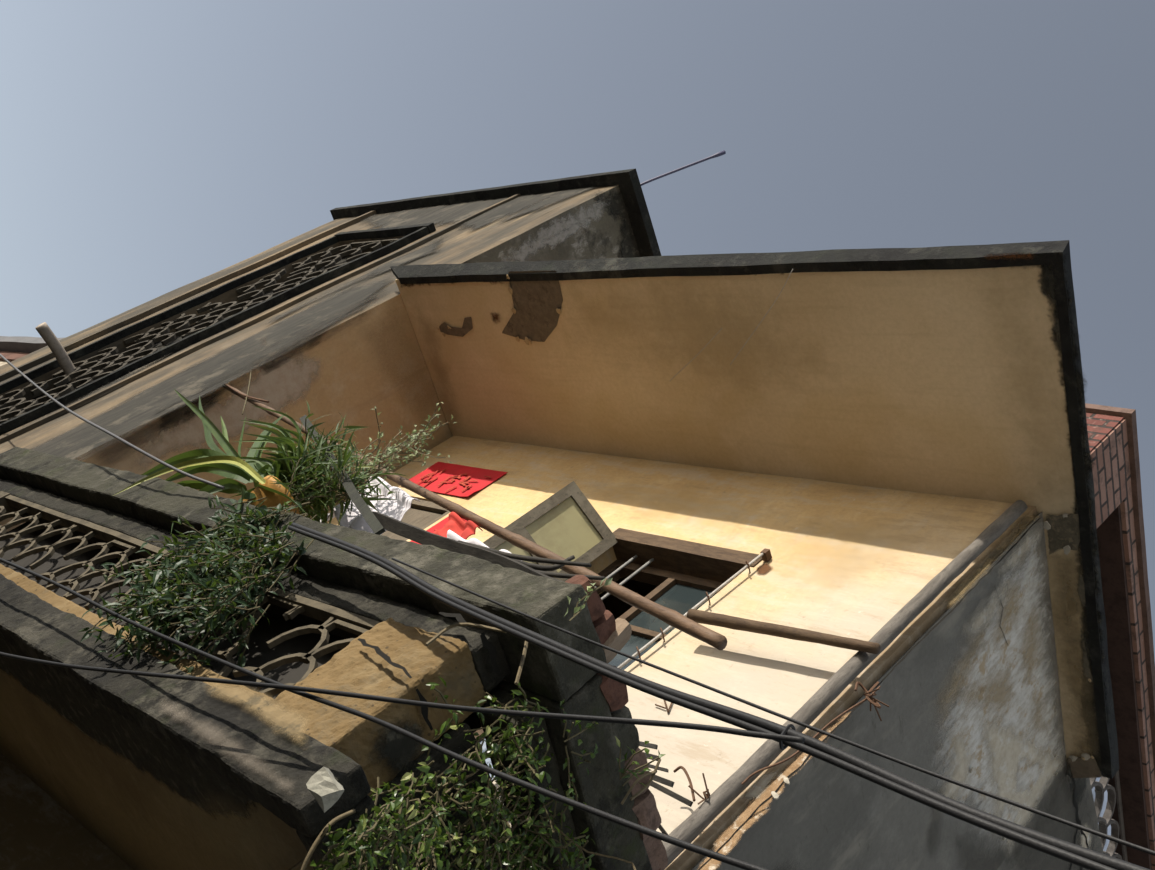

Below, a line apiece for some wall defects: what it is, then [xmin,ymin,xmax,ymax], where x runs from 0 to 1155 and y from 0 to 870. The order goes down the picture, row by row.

leakage [30,184,640,460]
spalling [437,317,473,337]
spalling [502,271,563,345]
leakage [1030,257,1109,775]
crack [357,638,433,730]
crack [698,518,1040,870]
leakage [1023,850,1088,870]
leakage [1043,765,1097,851]
crack [1069,775,1089,870]